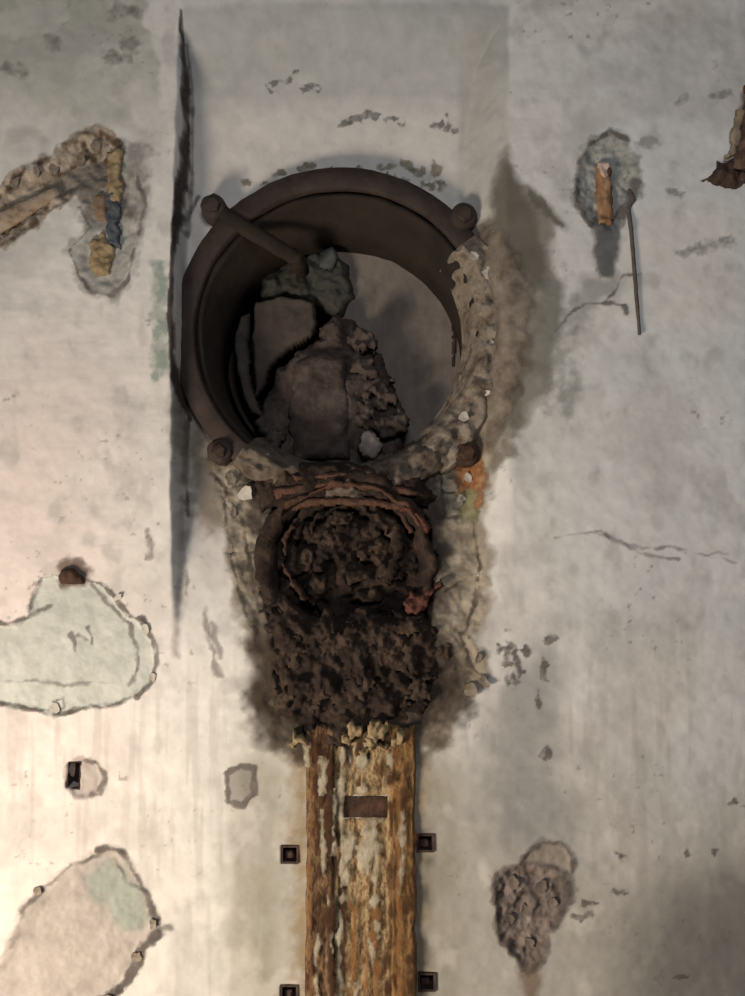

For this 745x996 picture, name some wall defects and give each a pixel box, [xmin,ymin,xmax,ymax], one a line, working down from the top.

flaking render [69,145,148,299]
flaking render [573,128,643,230]
leakage [412,165,561,475]
corrosion [456,453,488,523]
peeling [0,575,158,718]
flaking render [65,757,107,799]
flaking render [224,764,257,809]
peeling [0,846,161,996]
corrosion [295,738,418,996]